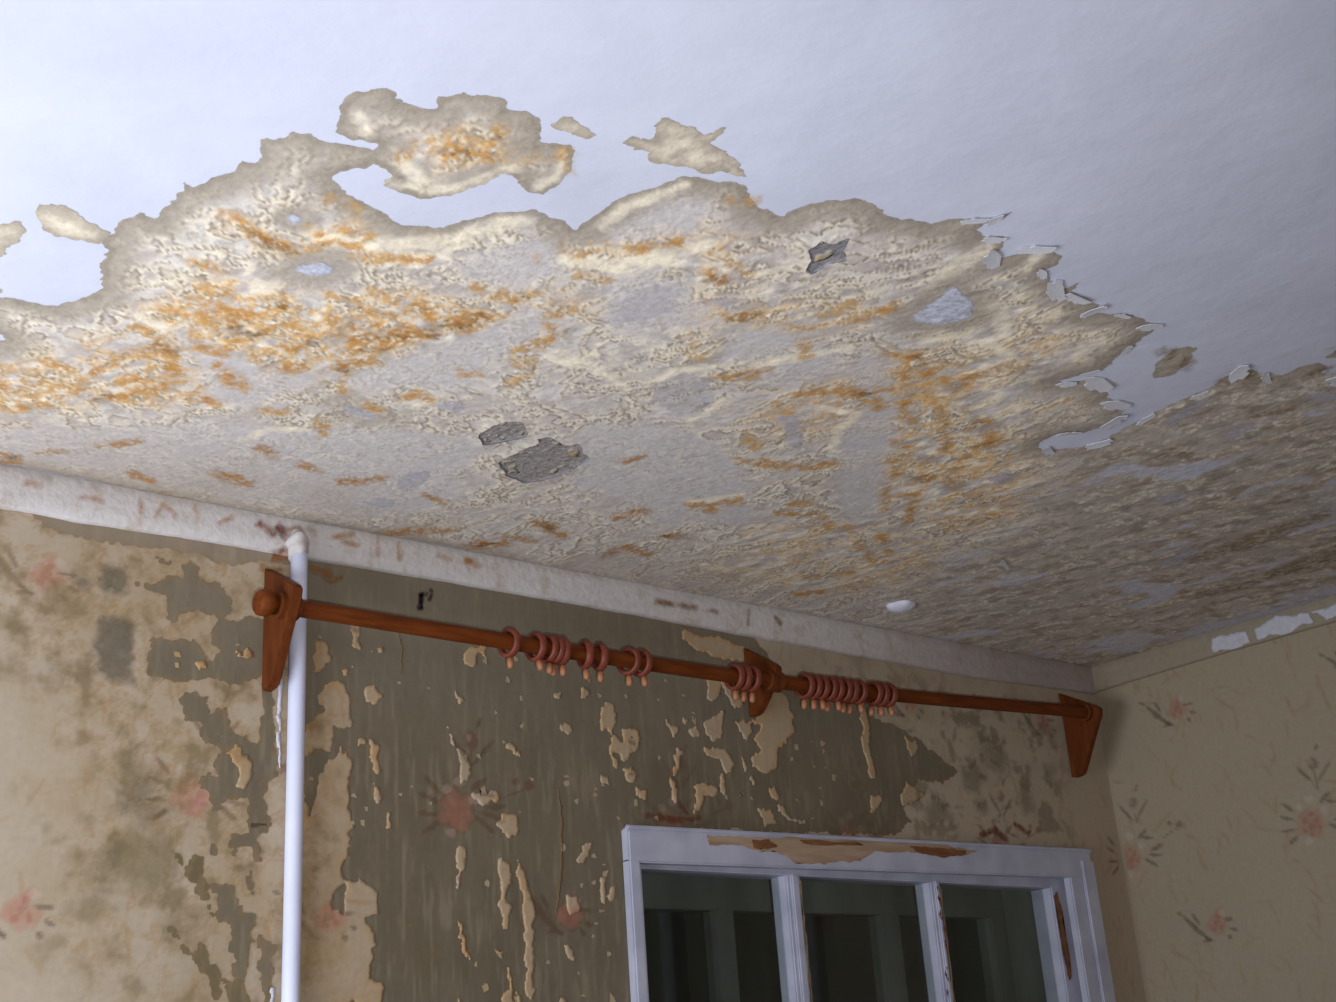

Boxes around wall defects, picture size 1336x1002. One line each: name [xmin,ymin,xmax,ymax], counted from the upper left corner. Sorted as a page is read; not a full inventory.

peeling [0,88,1336,667]
damp [83,570,125,592]
rust [257,522,295,572]
damp [94,619,133,679]
flaking render [33,514,290,1002]
damp [276,671,284,769]
flaking render [304,560,977,1002]
peeling [1054,891,1072,981]